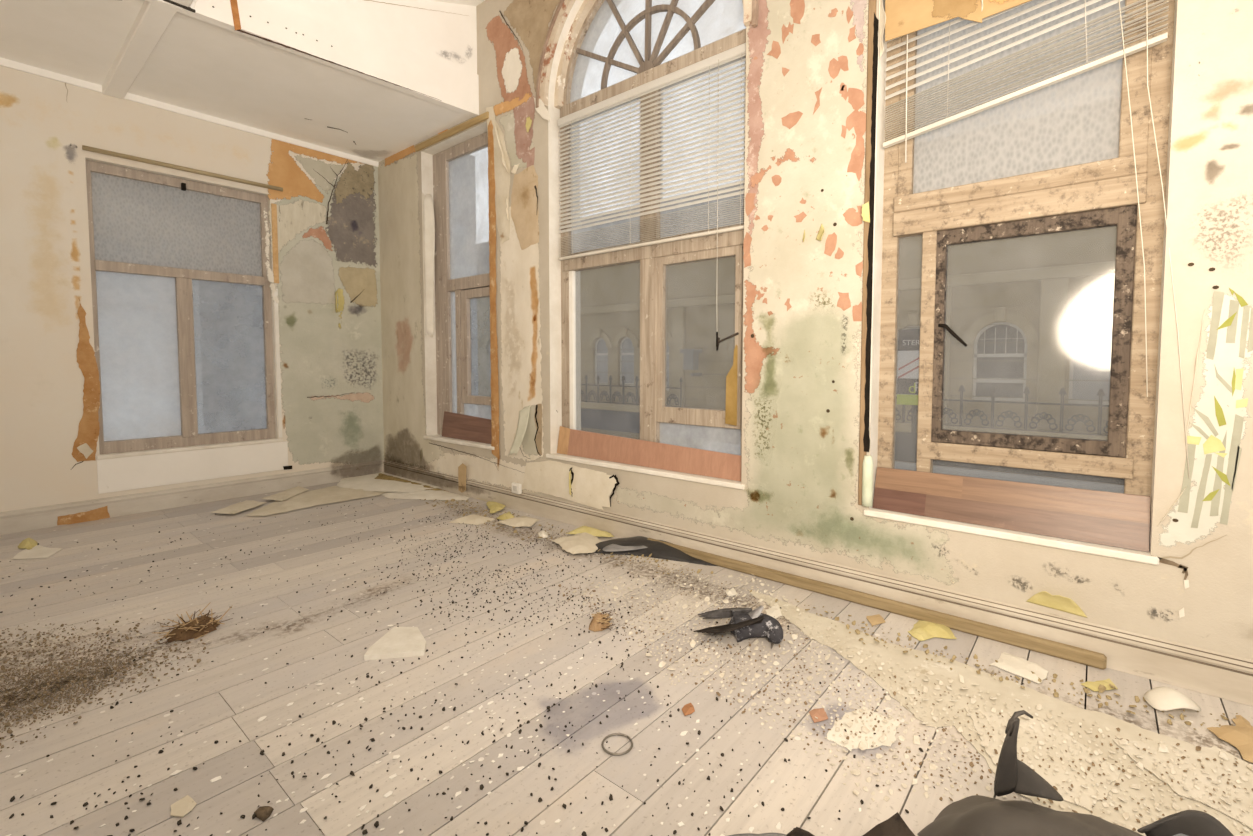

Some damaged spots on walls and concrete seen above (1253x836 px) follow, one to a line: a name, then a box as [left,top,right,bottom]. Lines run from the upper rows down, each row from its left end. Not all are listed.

flaking render [485,0,560,169]
peeling [72,299,100,462]
flaking render [274,154,444,467]
spalling [508,404,542,459]
crack [567,468,575,495]
crack [609,474,620,507]
flaking render [616,0,959,585]
crack [1151,535,1226,580]